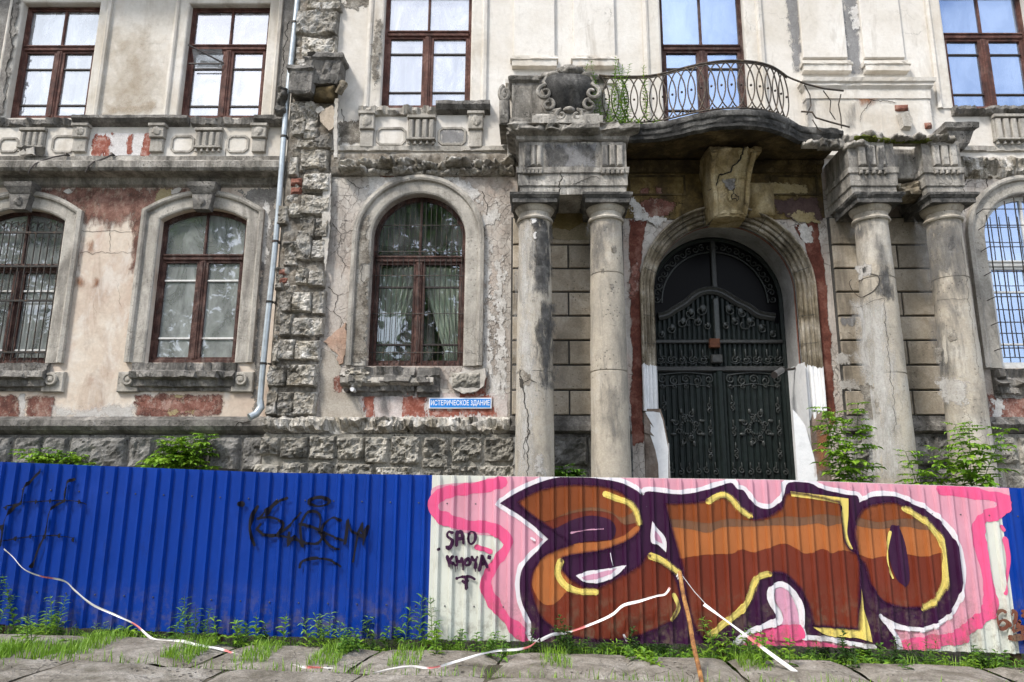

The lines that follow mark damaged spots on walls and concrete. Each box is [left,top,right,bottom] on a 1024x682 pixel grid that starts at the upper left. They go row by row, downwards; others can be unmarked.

peeling [40,187,190,272]
peeling [91,133,151,156]
crack [326,179,370,327]
spalling [232,0,532,418]
water stain [530,213,606,385]
peeling [627,187,676,446]
crack [708,147,744,201]
peeling [769,181,880,431]
peeling [0,394,55,417]
peeling [133,392,223,417]
crack [519,370,535,474]
peeling [988,389,1024,417]